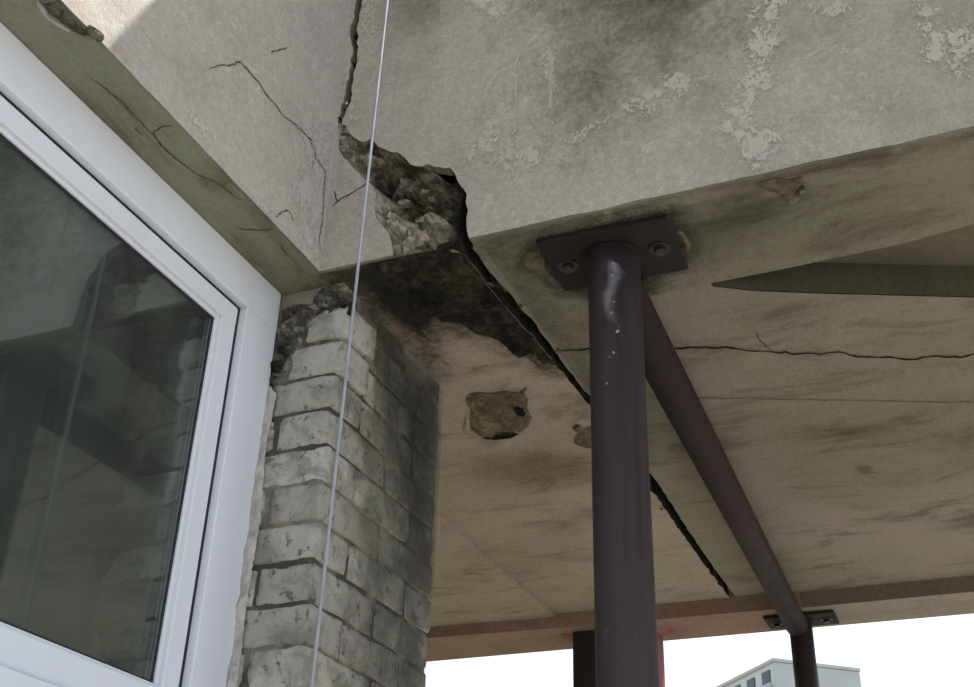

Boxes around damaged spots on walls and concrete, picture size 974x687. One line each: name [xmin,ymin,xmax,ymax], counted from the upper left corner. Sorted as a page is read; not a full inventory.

spalling [36,0,104,42]
crack [90,78,243,200]
crack [210,61,366,255]
peeling [716,0,793,170]
peeling [907,0,974,85]
spalling [269,284,355,385]
spalling [291,99,554,371]
leakage [328,248,540,367]
crack [457,191,590,396]
crack [675,333,974,360]
spalling [463,388,532,440]
crack [650,473,728,589]